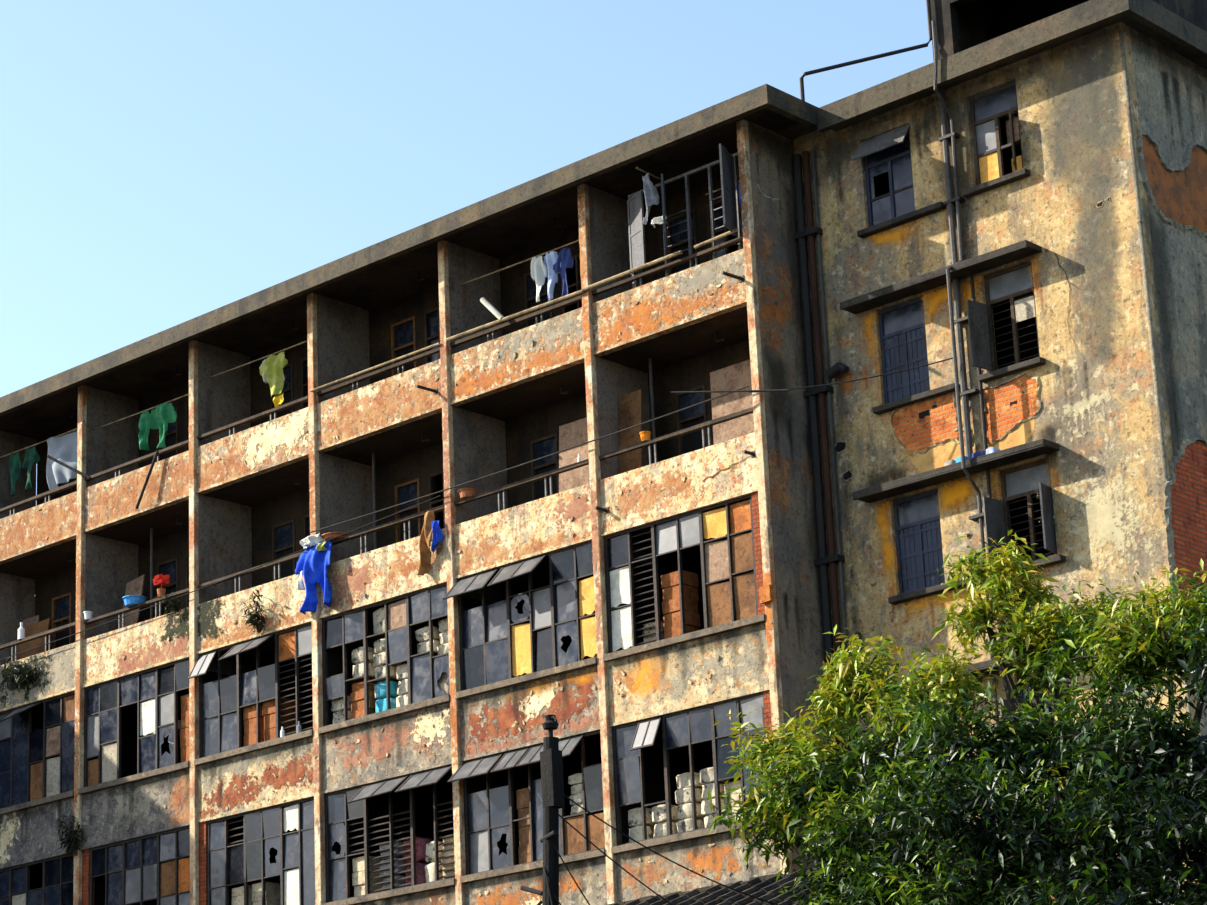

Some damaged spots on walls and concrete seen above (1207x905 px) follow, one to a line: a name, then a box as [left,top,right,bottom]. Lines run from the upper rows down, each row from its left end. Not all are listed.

flaking render [1136,129,1207,240]
flaking render [889,370,1043,473]
flaking render [1164,433,1207,614]
rust [515,671,594,695]